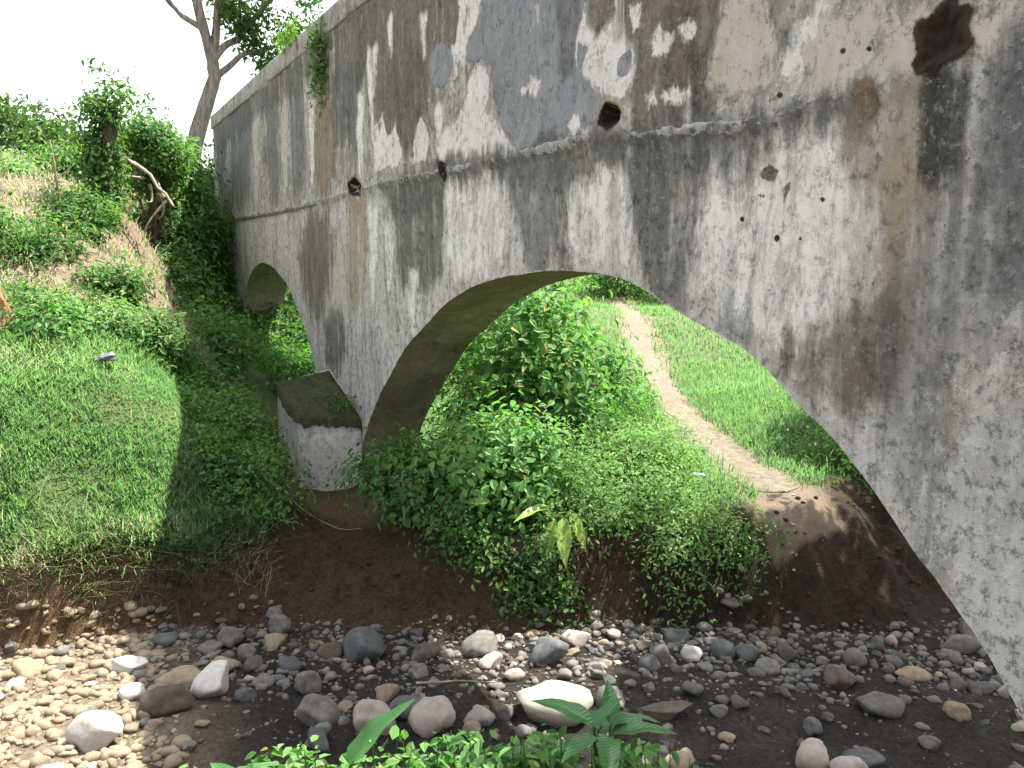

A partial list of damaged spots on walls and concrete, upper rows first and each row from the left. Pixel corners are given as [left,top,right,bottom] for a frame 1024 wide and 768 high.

peeling [650,18,697,57]
damp [767,0,837,91]
peeling [802,0,1024,101]
damp [216,0,768,310]
peeling [355,0,642,287]
peeling [646,86,691,109]
damp [783,80,869,168]
corrosion [853,75,881,142]
damp [298,209,345,374]
peeling [408,268,419,326]
corrosion [782,89,923,417]